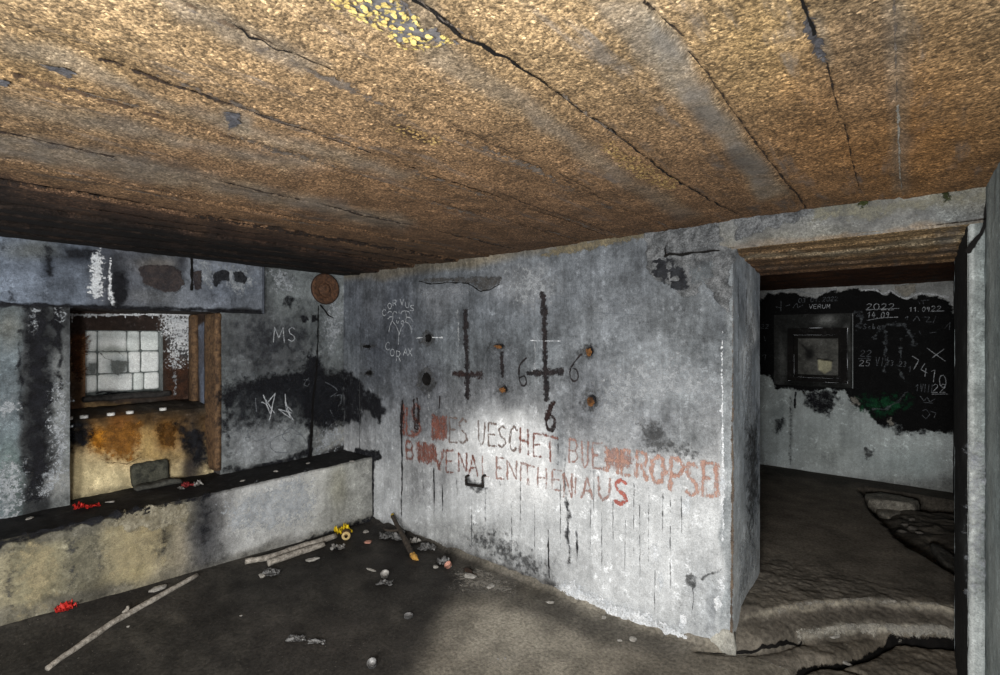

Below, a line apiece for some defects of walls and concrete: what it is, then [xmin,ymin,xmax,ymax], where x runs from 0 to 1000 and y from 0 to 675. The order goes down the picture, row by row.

crack [412,0,737,214]
crack [642,0,806,208]
crack [826,63,862,193]
flaking render [644,209,812,313]
water stain [40,248,189,496]
corrosion [88,421,142,462]
corrosion [157,419,178,449]
crack [701,633,954,675]